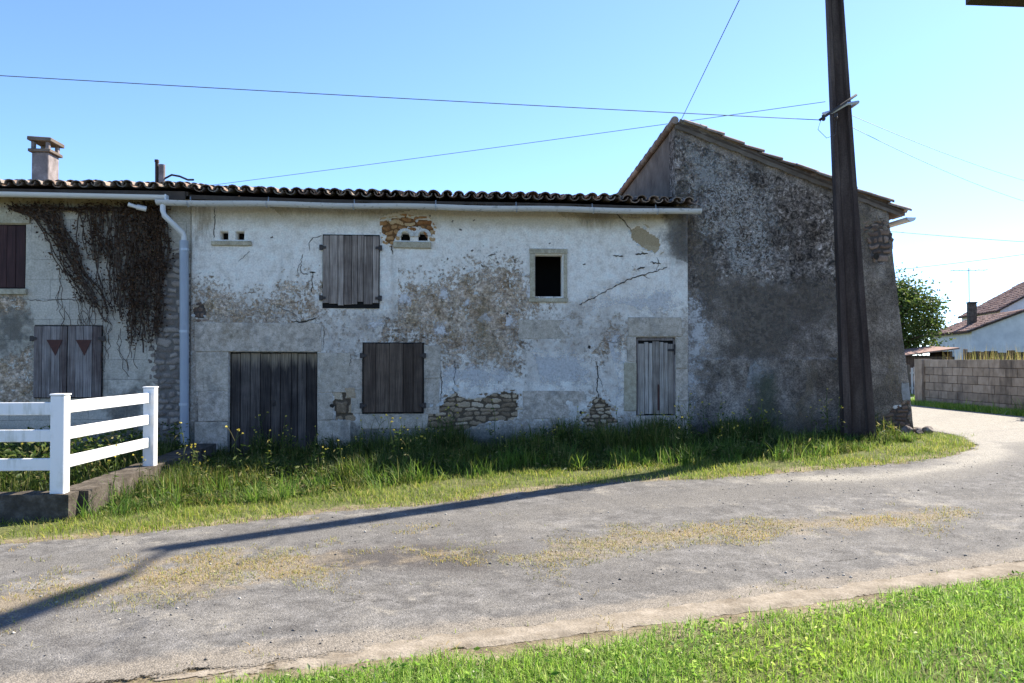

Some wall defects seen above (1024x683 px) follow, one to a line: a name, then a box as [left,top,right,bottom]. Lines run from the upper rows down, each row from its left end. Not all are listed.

flaking render [380,214,437,254]
flaking render [628,224,664,270]
crack [579,258,667,305]
flaking render [369,245,556,394]
crack [596,340,627,397]